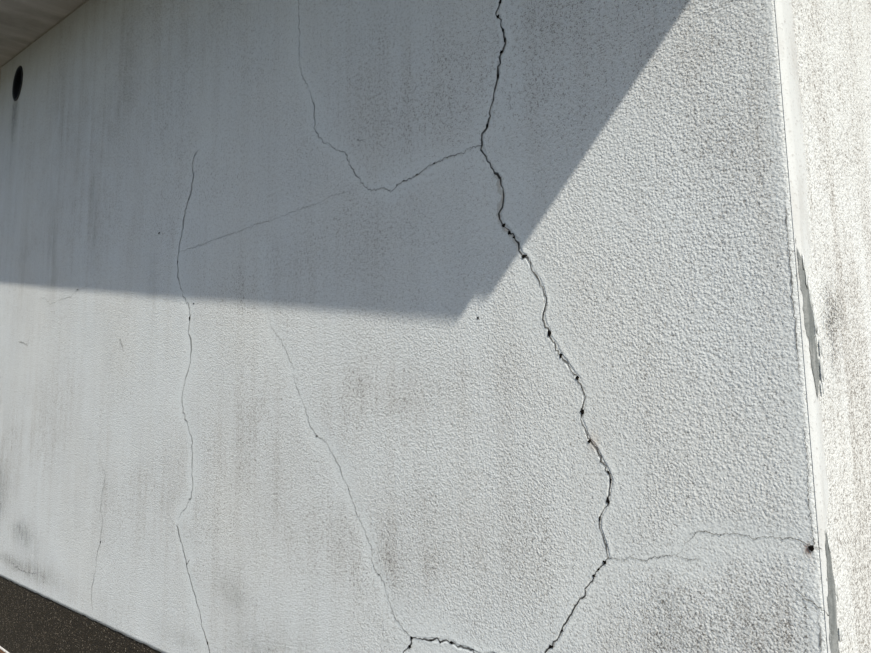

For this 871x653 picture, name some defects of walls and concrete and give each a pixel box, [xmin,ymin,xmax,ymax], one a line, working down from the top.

crack [313,0,693,653]
crack [695,433,822,550]